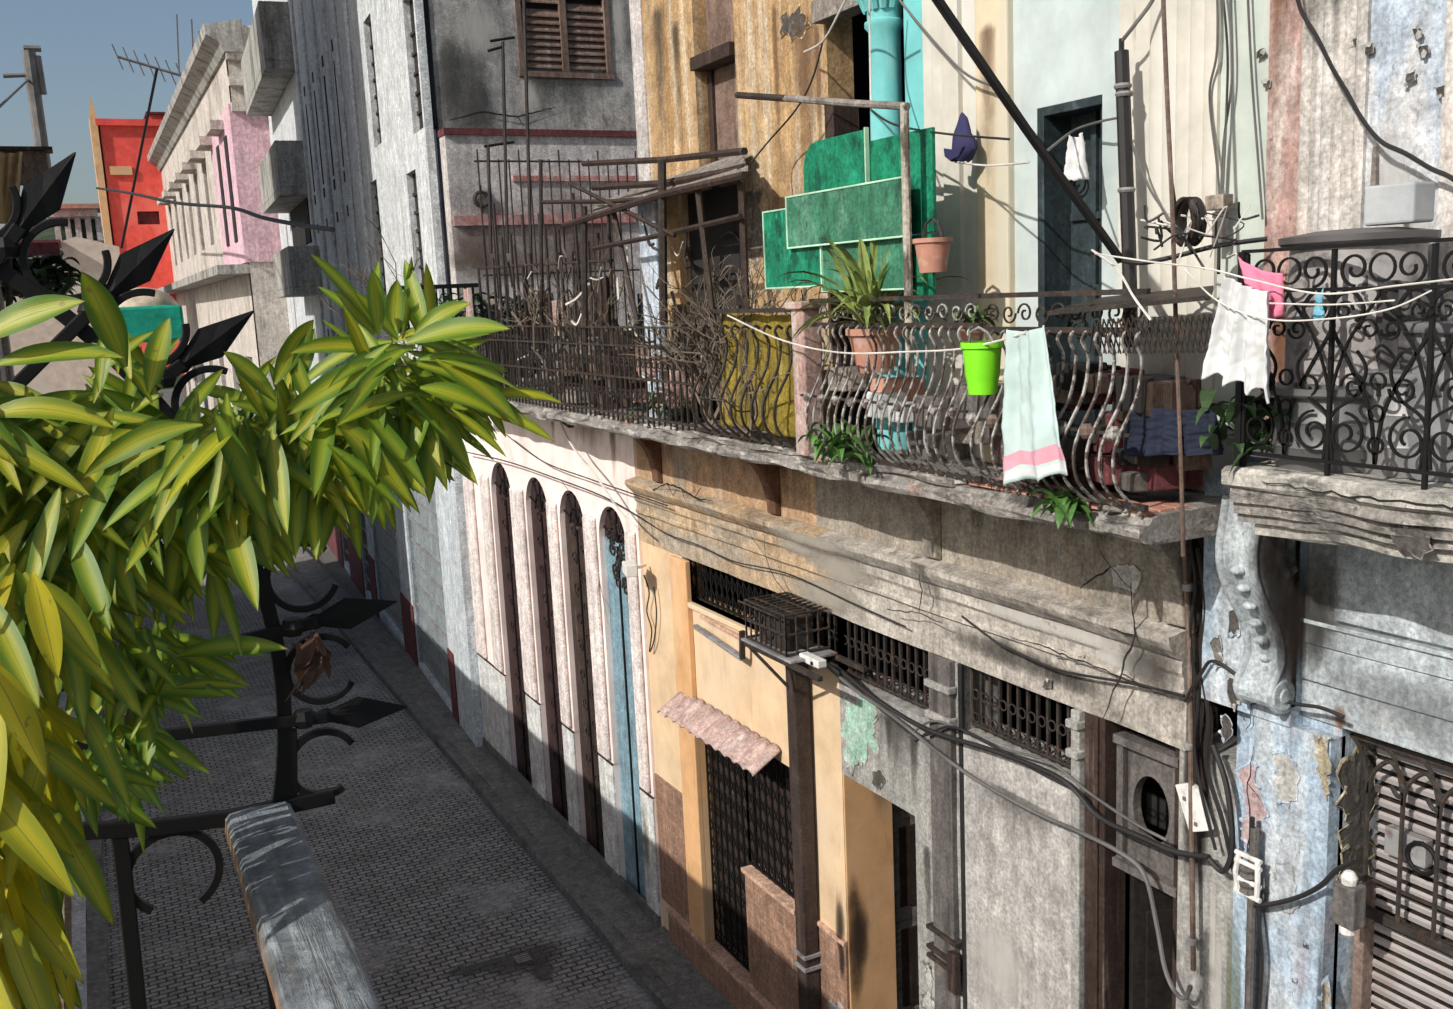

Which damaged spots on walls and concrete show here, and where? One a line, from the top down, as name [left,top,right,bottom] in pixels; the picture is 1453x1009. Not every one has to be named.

spalling [1108,563,1144,598]
crack [1011,552,1171,719]
peeling [839,690,888,790]
spalling [1234,732,1381,882]
damp [840,914,866,975]